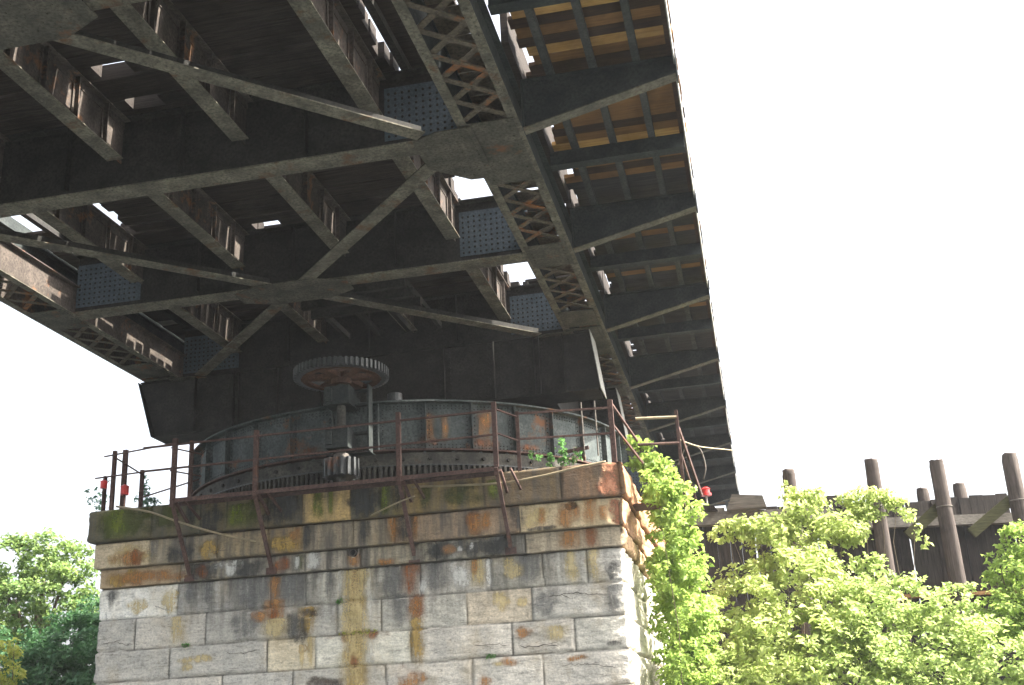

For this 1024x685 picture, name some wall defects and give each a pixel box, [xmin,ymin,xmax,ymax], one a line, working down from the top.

rust [109,545,183,638]
rust [251,530,299,637]
rust [341,556,377,685]
rust [378,559,423,661]
rust [559,499,606,579]